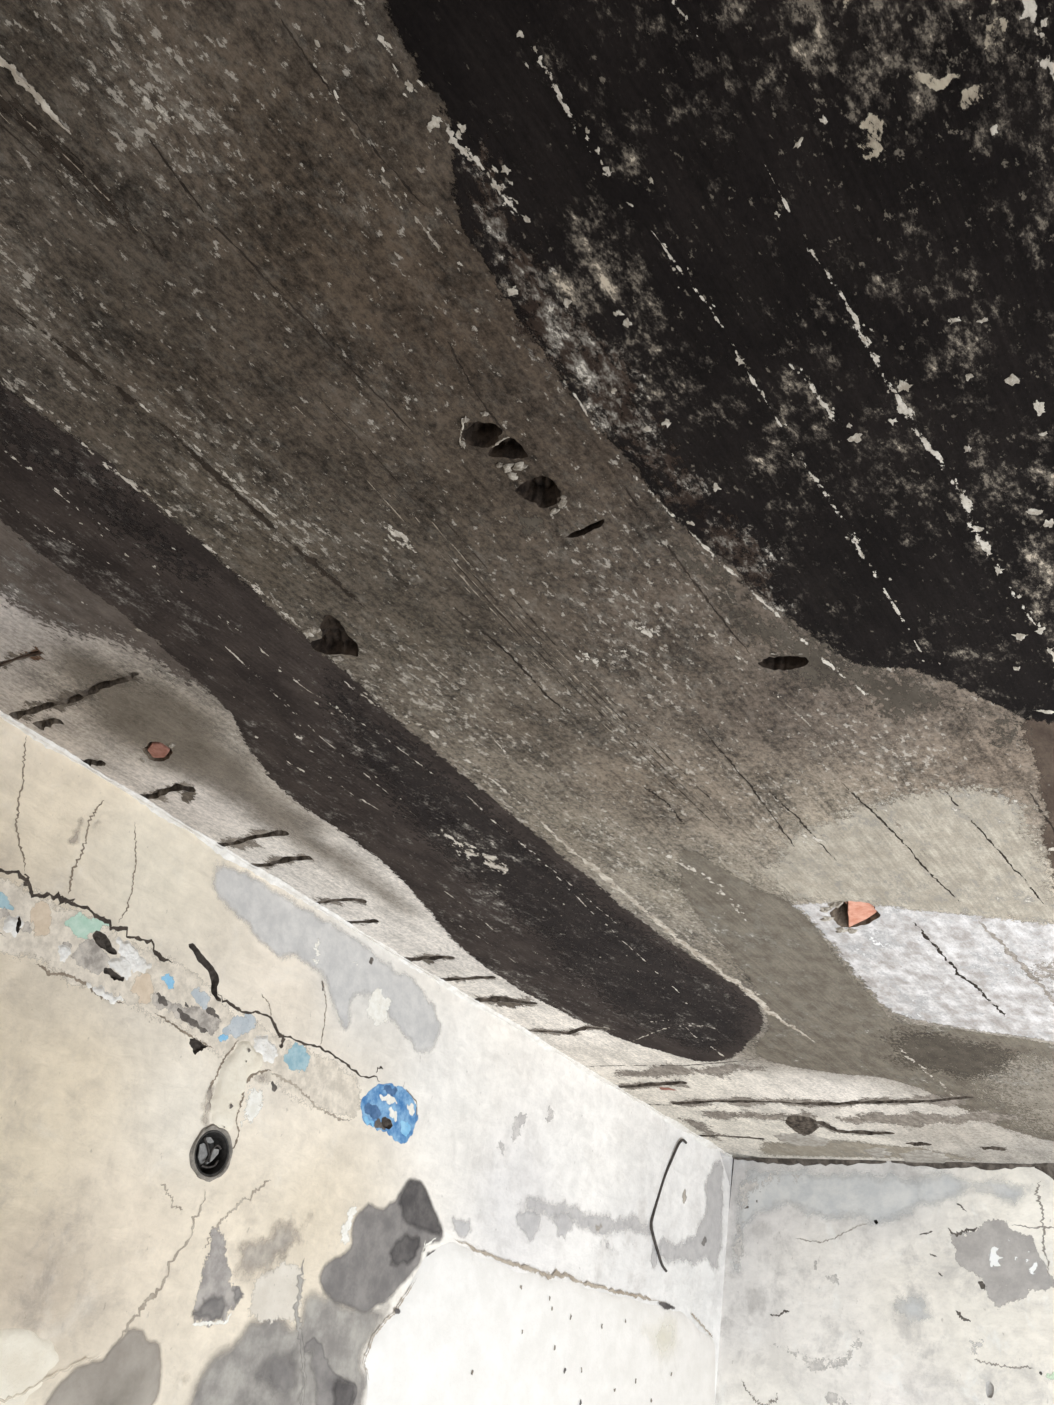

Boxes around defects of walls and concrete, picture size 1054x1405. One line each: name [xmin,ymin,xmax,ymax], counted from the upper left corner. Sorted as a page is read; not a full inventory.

spalling [562,519,605,538]
spalling [291,614,359,662]
water stain [0,512,349,865]
flaking render [92,930,124,982]
crack [0,738,383,1082]
flaking render [213,829,441,1053]
flaking render [189,1038,208,1055]
water stain [191,1180,443,1405]
flaking render [950,1219,1054,1308]
crack [1012,1181,1054,1274]
crack [975,1359,1032,1369]